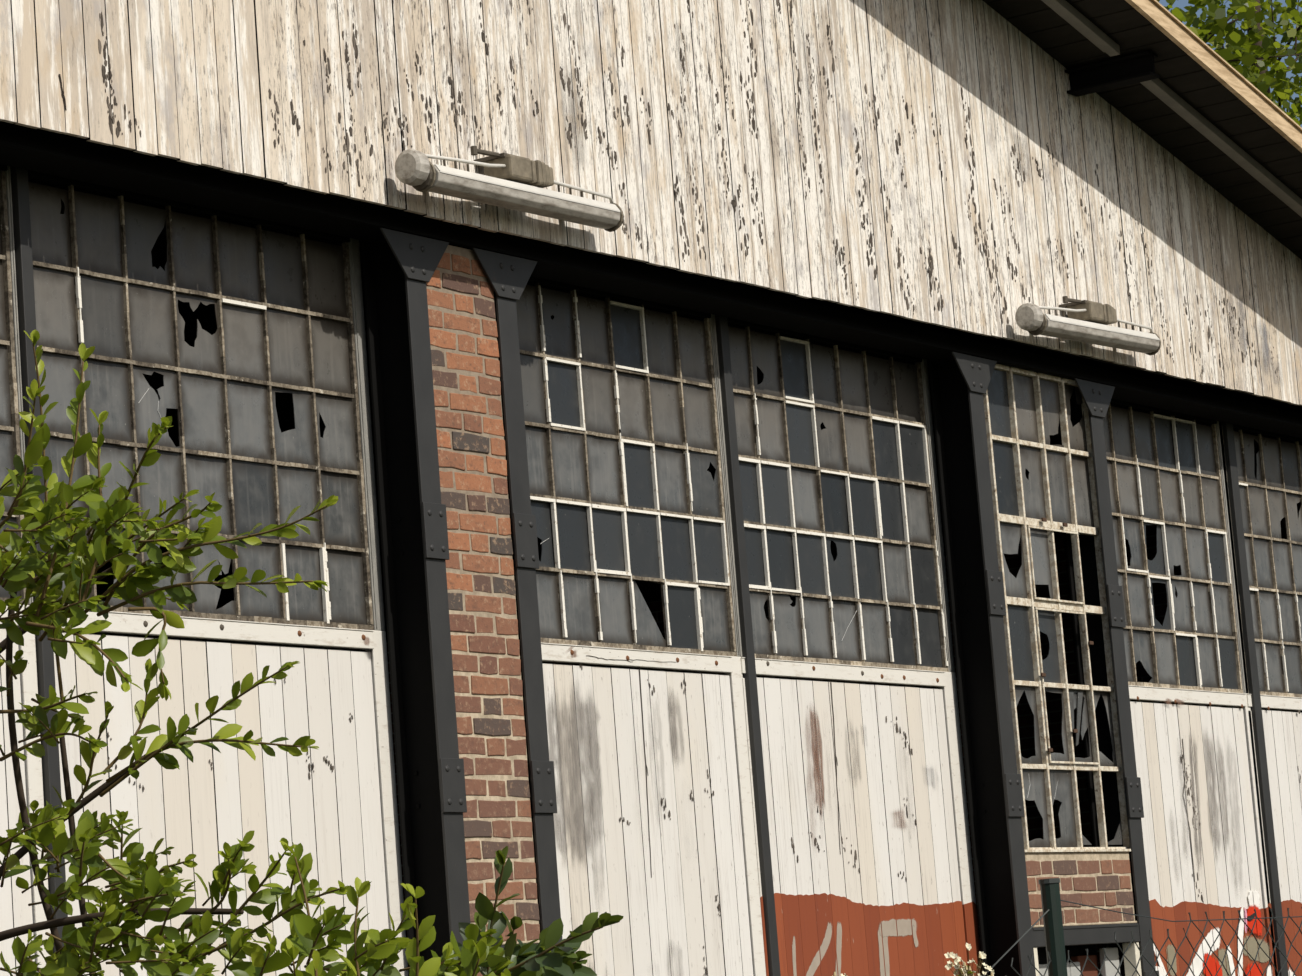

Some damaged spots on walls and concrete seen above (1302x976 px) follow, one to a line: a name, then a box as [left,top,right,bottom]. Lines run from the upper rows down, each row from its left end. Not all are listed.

peeling [98,12,141,137]
peeling [268,89,301,147]
peeling [323,23,373,200]
peeling [560,13,642,249]
peeling [674,167,706,262]
peeling [708,0,763,256]
peeling [776,0,836,200]
peeling [853,127,915,315]
peeling [951,87,1058,324]
damp [549,700,600,856]
corrosion [810,714,824,813]
damp [1189,743,1224,865]